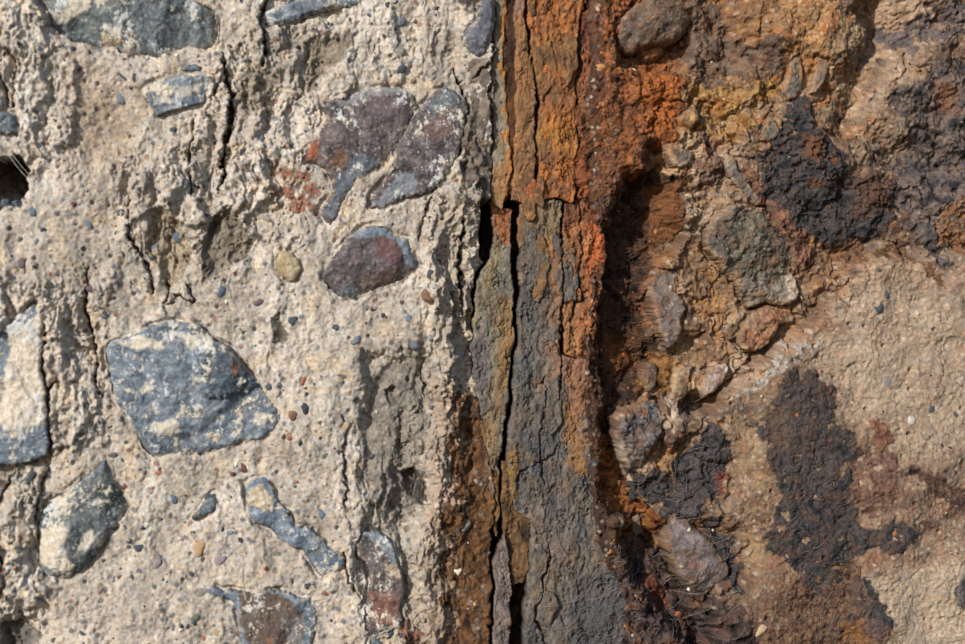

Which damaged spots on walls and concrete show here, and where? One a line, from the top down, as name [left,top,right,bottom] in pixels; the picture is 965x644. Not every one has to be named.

crack [209,61,236,185]
crack [259,1,267,67]
crack [456,32,494,122]
crack [85,275,100,393]
rust [433,0,965,644]
efflorescence [736,335,823,396]